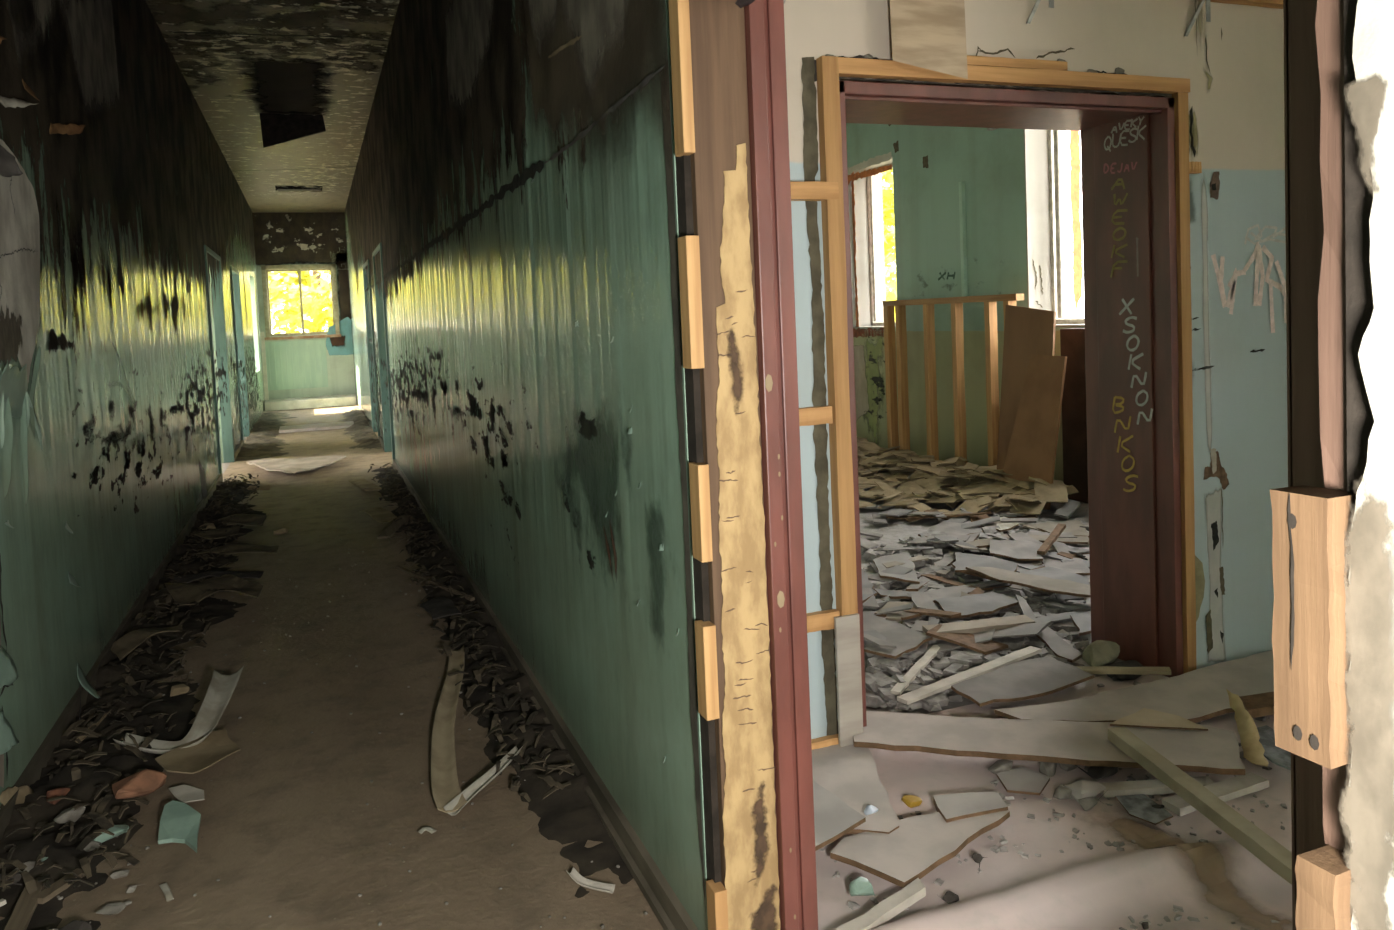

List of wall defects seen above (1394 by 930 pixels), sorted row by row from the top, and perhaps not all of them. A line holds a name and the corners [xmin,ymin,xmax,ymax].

peeling [0,0,120,135]
peeling [162,0,399,199]
peeling [0,553,20,788]
peeling [77,663,100,698]